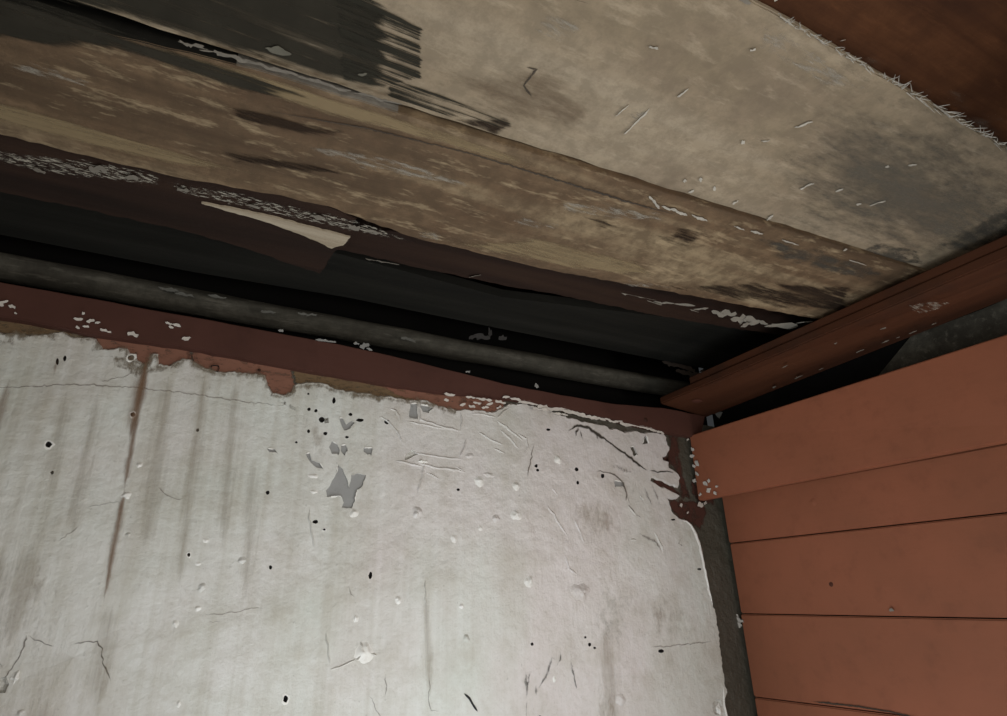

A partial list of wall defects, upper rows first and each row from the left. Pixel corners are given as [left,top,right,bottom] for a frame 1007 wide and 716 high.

water stain [0,0,510,134]
peeling [73,312,111,333]
peeling [469,328,507,340]
peeling [622,293,813,329]
corrosion [125,365,147,481]
peeling [409,403,433,420]
peeling [444,392,664,456]
peeling [326,441,366,508]
crack [570,425,673,516]
peeling [680,438,718,514]
corrosion [106,498,124,588]